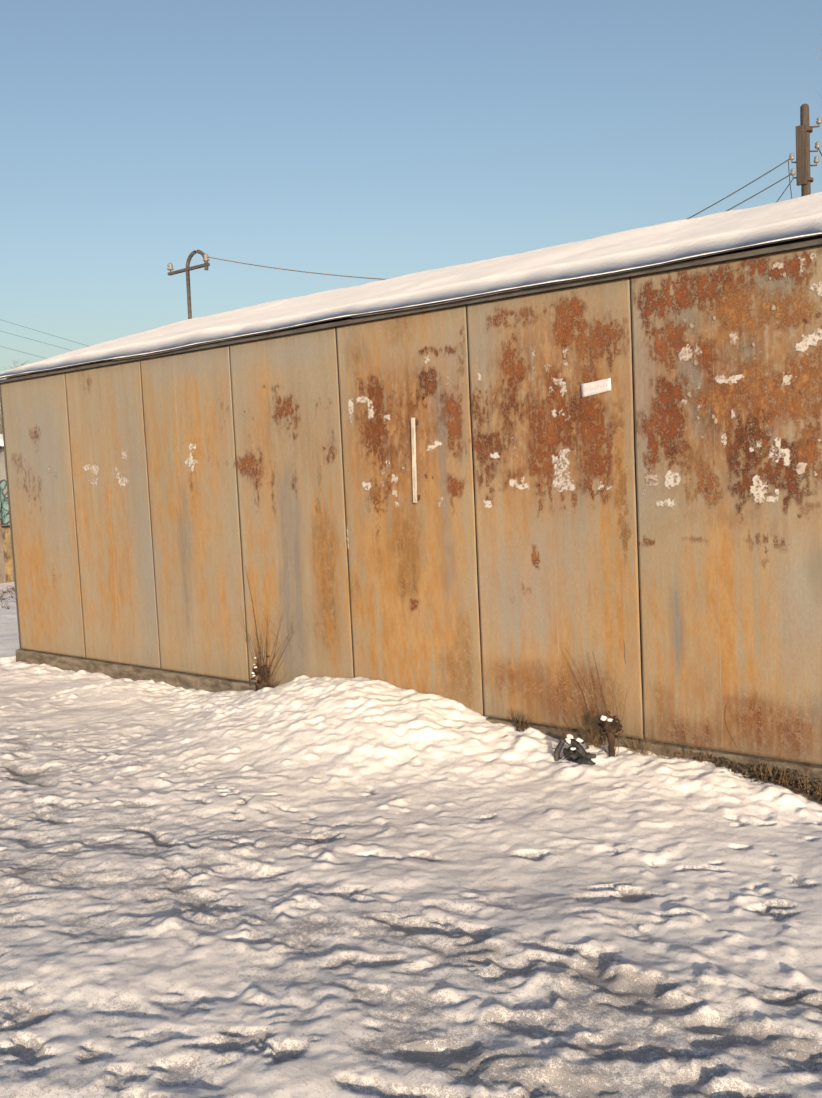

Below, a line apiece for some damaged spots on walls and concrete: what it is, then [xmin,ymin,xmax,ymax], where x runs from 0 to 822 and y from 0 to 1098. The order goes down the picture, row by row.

corrosion [235,453,274,508]
corrosion [264,386,298,439]
corrosion [357,297,655,551]
corrosion [634,251,822,518]